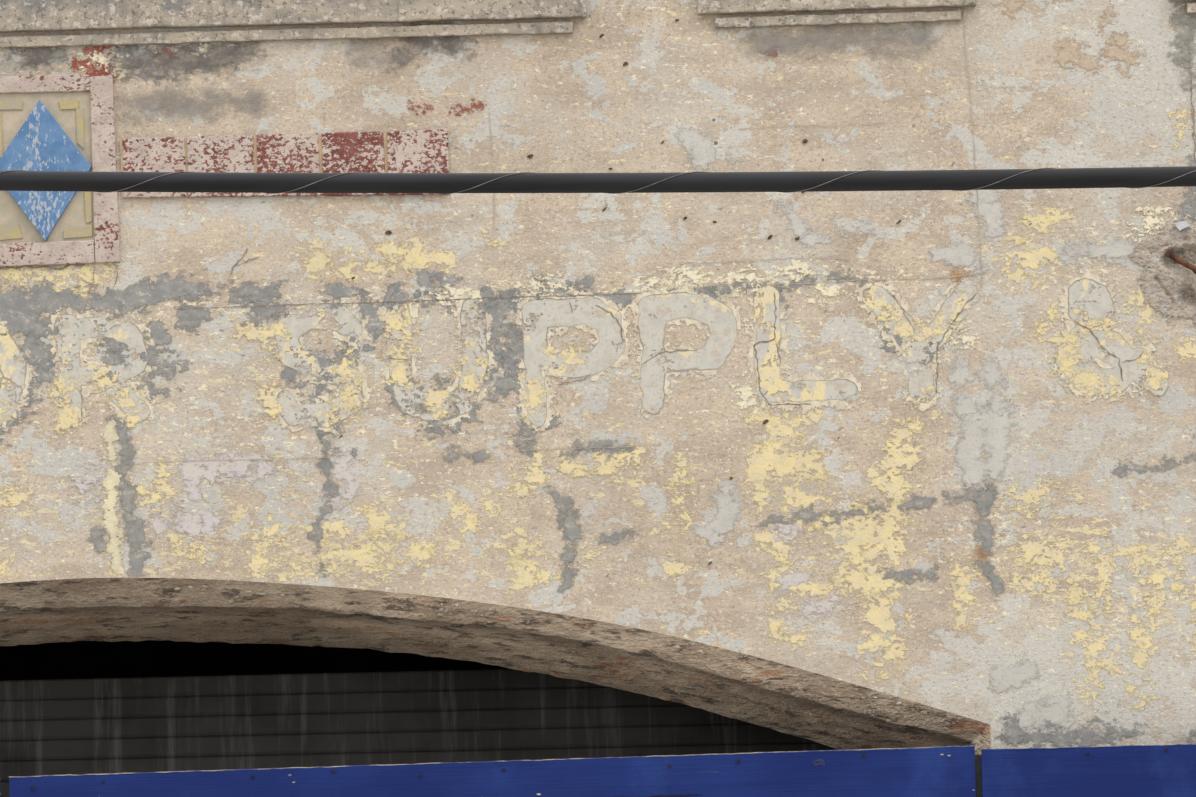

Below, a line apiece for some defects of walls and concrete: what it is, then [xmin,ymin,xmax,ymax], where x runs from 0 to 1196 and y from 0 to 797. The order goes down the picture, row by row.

peeling [992,0,1073,21]
peeling [1053,0,1147,80]
water stain [1167,1,1196,91]
peeling [724,197,876,308]
spalling [928,190,1196,403]
peeling [0,228,709,627]
peeling [654,292,1196,748]